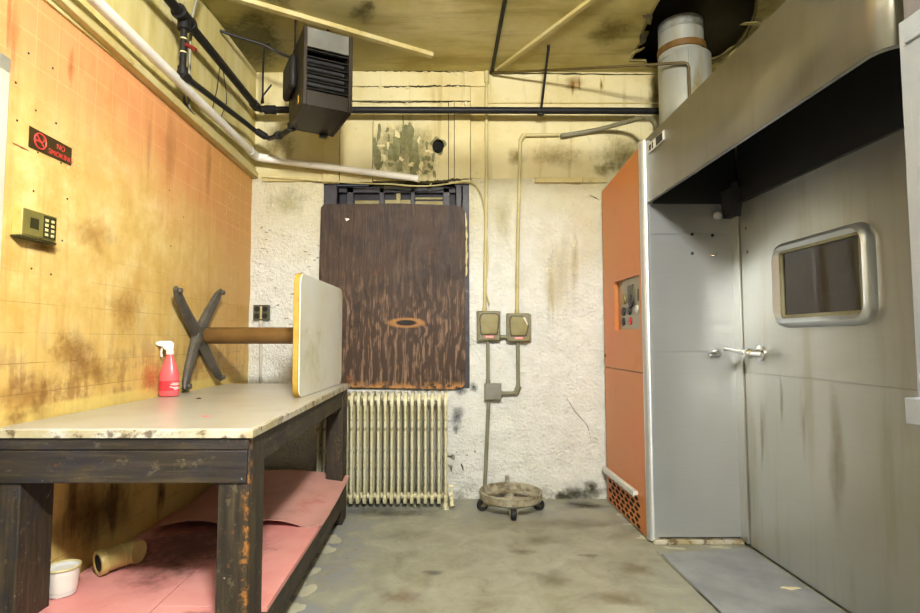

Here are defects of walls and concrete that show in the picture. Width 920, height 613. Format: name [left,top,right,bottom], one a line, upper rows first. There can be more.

peeling [364,70,472,90]
peeling [372,116,472,185]
leakage [556,483,599,508]